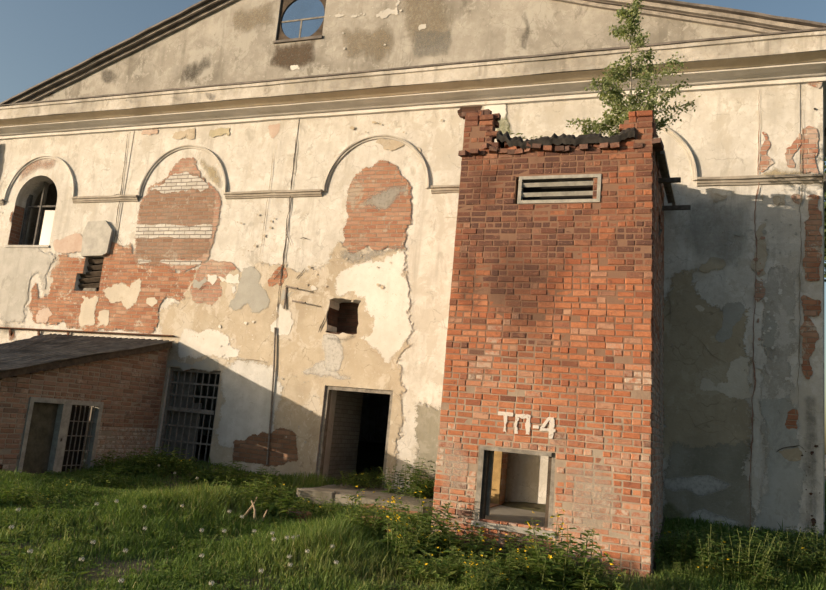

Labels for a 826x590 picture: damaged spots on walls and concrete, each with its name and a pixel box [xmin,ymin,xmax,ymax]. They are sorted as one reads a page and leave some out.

leakage [271,43,313,68]
leakage [406,0,449,55]
spalling [758,132,774,172]
spalling [785,126,819,174]
flaking render [137,157,201,225]
crack [259,132,307,329]
flaking render [27,182,411,490]
flaking render [750,194,823,429]